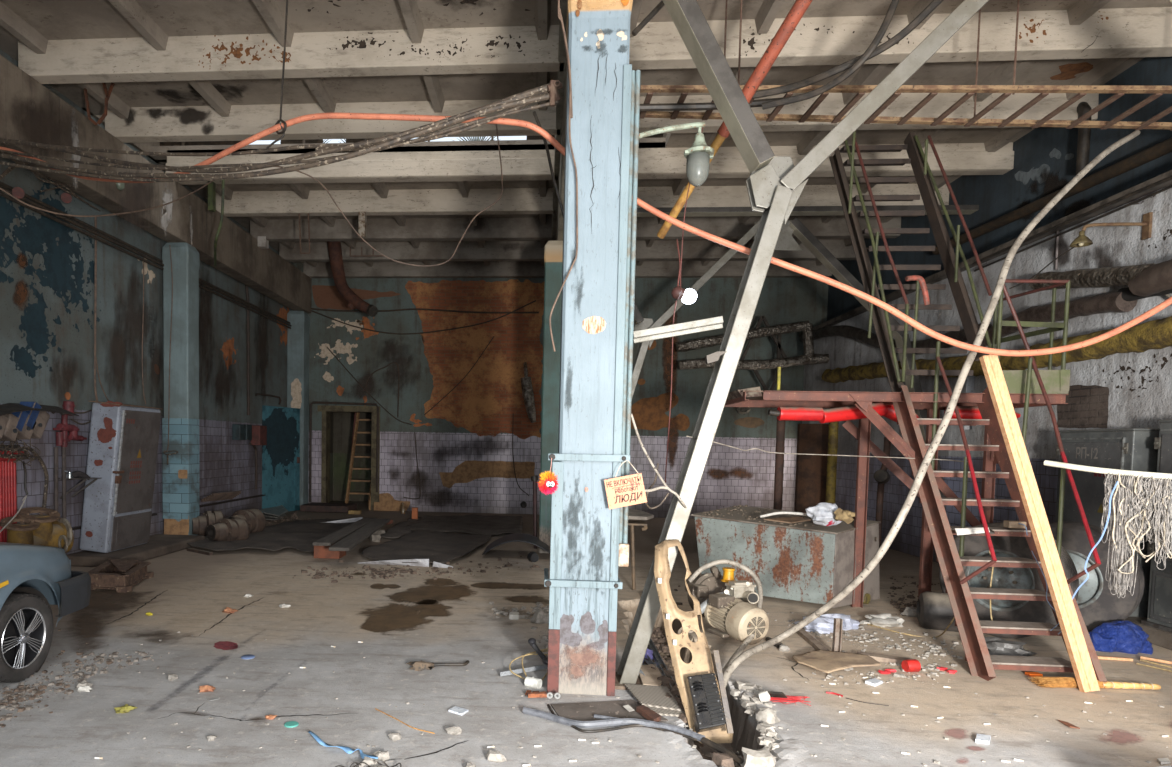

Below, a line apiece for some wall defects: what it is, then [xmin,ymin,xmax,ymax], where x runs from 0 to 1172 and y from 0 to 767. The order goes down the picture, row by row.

peeling [580,29,627,48]
crack [589,54,621,231]
peeling [0,178,101,378]
flaking render [312,279,545,439]